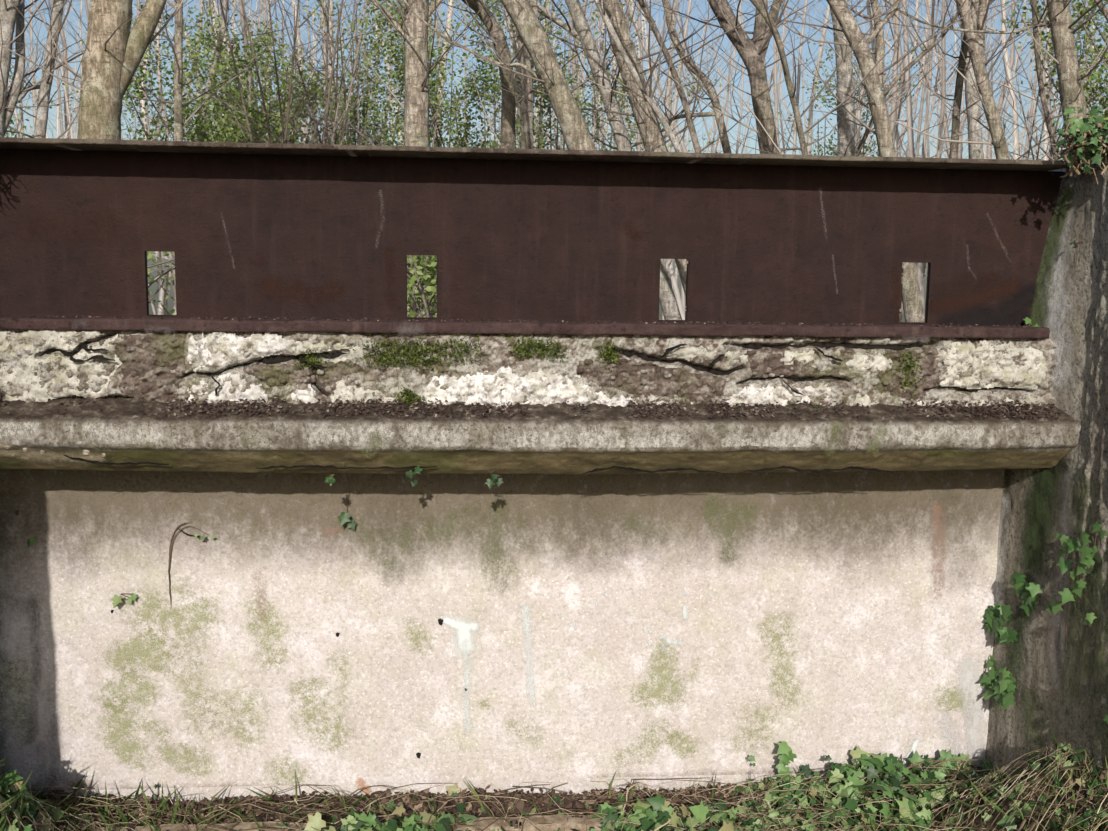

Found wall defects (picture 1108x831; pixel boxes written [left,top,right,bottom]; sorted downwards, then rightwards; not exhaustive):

damp [940,224,1068,385]
crack [41,332,118,362]
peeling [0,330,406,404]
crack [180,352,345,397]
peeling [420,339,1048,408]
crack [618,342,932,395]
crack [930,385,1029,393]
crack [63,455,169,466]
damp [0,469,1010,602]
damp [443,617,478,732]